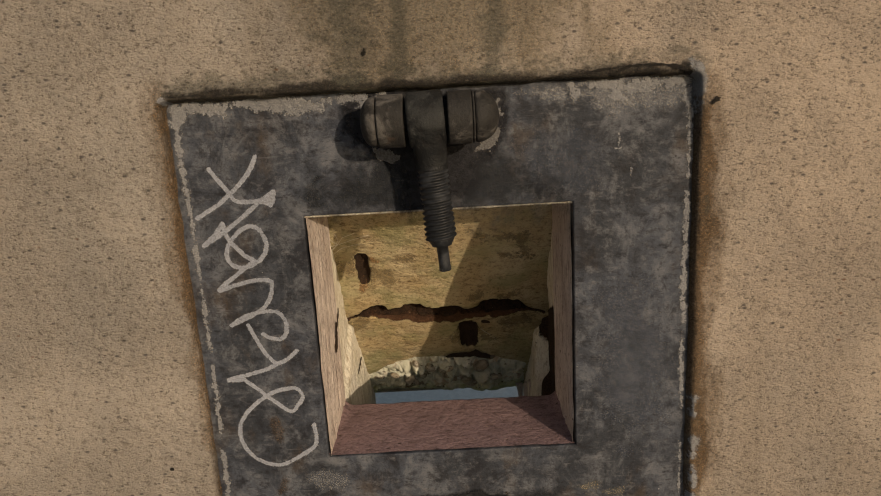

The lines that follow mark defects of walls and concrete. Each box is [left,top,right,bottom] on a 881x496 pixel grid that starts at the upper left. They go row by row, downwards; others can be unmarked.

leakage [156,0,708,353]
leakage [211,365,224,434]
spalling [369,320,526,393]
crack [347,298,556,396]
leakage [678,339,700,418]
leakage [220,448,231,496]
leakage [677,434,700,496]